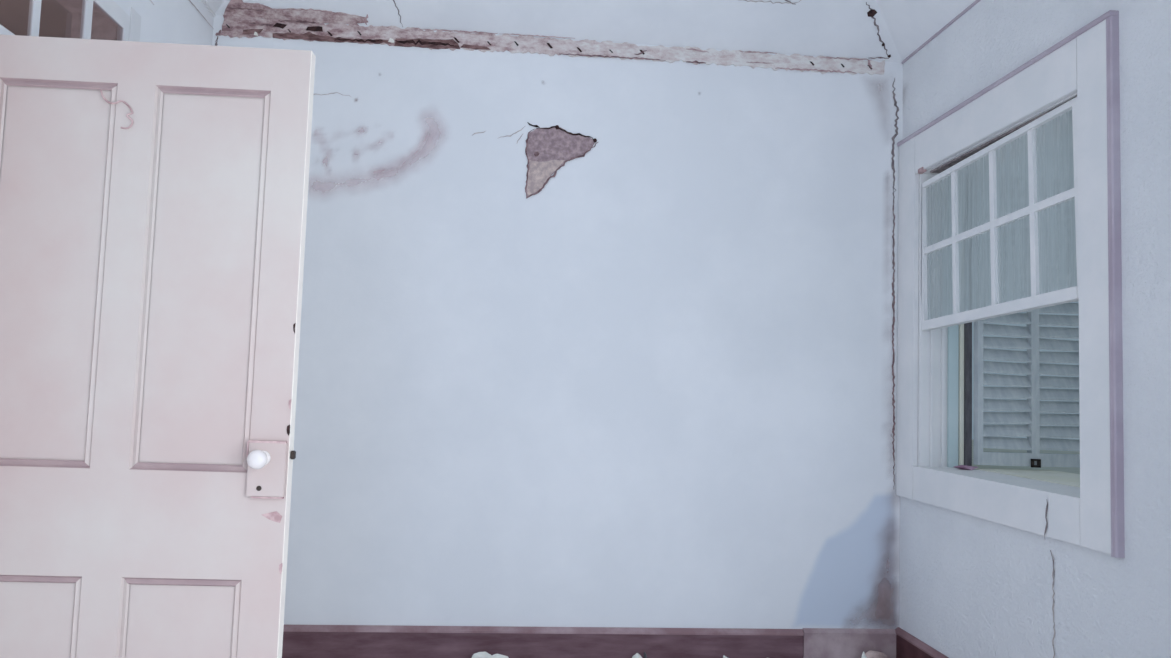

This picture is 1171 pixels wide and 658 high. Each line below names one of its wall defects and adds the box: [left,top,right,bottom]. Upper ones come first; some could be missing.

crack [189,0,244,46]
peeling [497,122,598,198]
crack [866,2,899,485]
water stain [788,488,900,629]
crack [1044,499,1055,658]